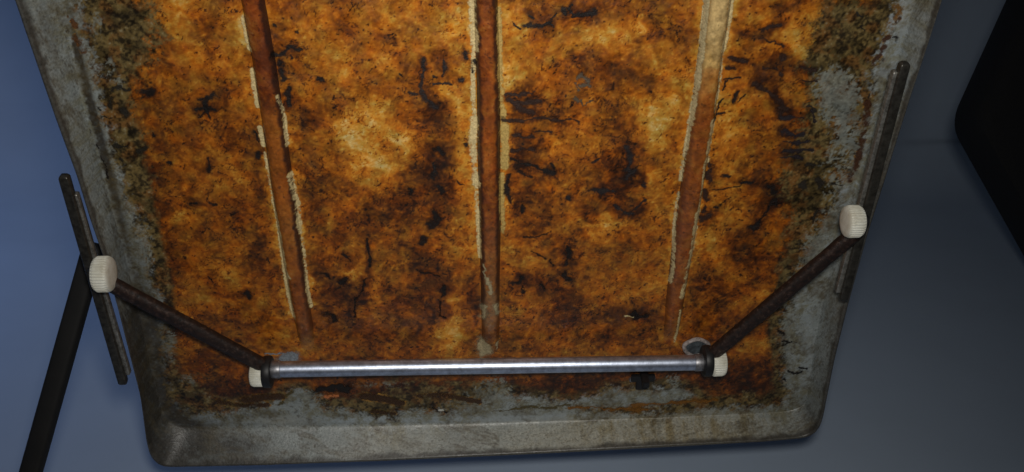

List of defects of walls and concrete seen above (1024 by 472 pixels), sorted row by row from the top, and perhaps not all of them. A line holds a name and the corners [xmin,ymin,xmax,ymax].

rust [872,35,898,65]
rust [848,100,872,183]
rust [216,391,294,408]